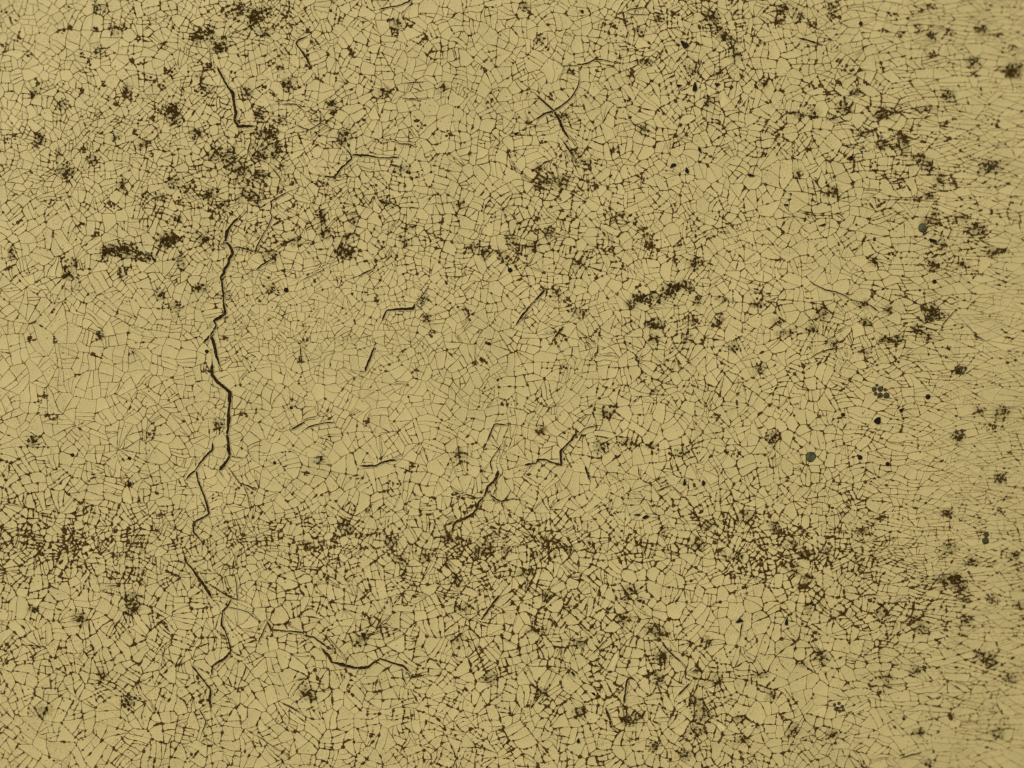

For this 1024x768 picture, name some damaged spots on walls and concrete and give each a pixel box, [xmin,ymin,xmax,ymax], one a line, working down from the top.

crack [208,46,255,155]
crack [381,287,432,321]
crack [183,167,424,743]
crack [449,422,510,534]
crack [525,425,595,481]